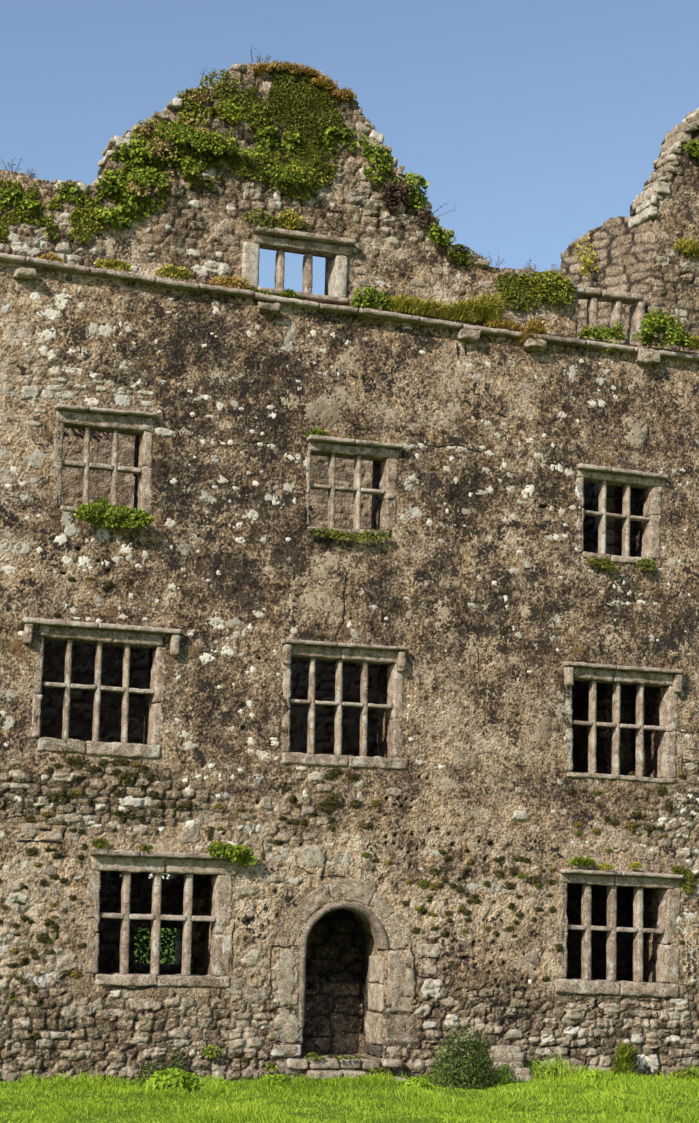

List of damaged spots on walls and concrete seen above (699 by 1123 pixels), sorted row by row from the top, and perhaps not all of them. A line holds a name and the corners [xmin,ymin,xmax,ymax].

leakage [243,445,282,464]
leakage [307,425,405,449]
leakage [361,326,441,411]
leakage [460,386,534,443]
leakage [535,366,567,408]
leakage [654,362,699,477]
leakage [408,472,574,749]
leakage [564,538,699,674]